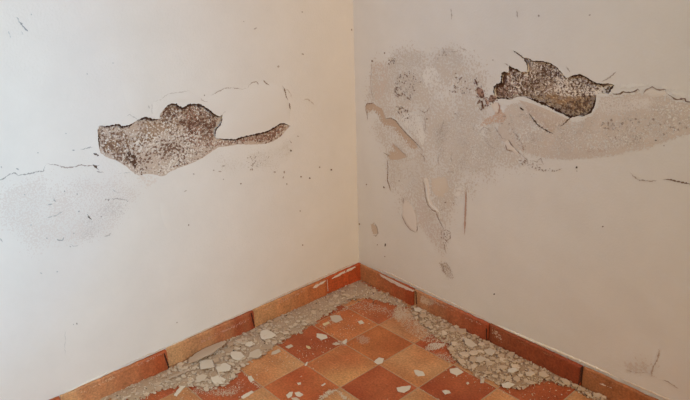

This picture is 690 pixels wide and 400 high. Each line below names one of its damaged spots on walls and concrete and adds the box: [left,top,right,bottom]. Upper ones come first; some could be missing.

spalling [474,58,614,118]
crack [0,147,101,180]
spalling [97,103,289,176]
peeling [365,103,418,160]